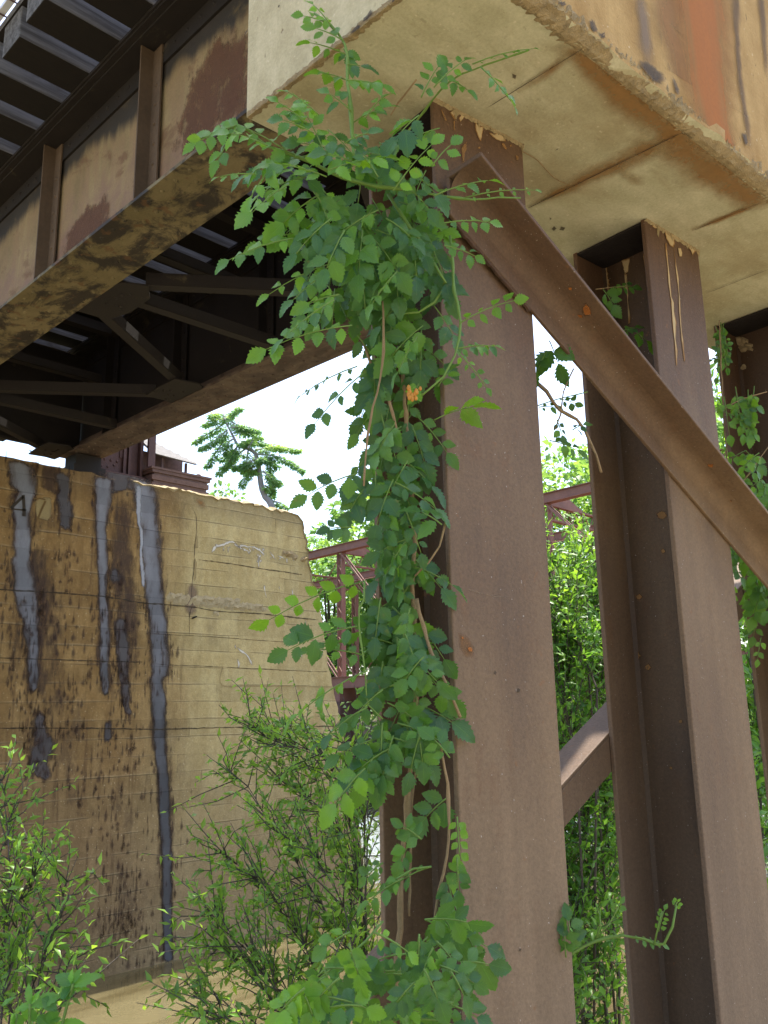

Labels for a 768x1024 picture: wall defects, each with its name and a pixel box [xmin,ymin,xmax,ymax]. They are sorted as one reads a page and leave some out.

corrosion [65,196,109,254]
spalling [511,0,768,203]
corrosion [542,50,766,226]
damp [639,0,679,94]
corrosion [658,0,735,146]
damp [0,451,188,967]